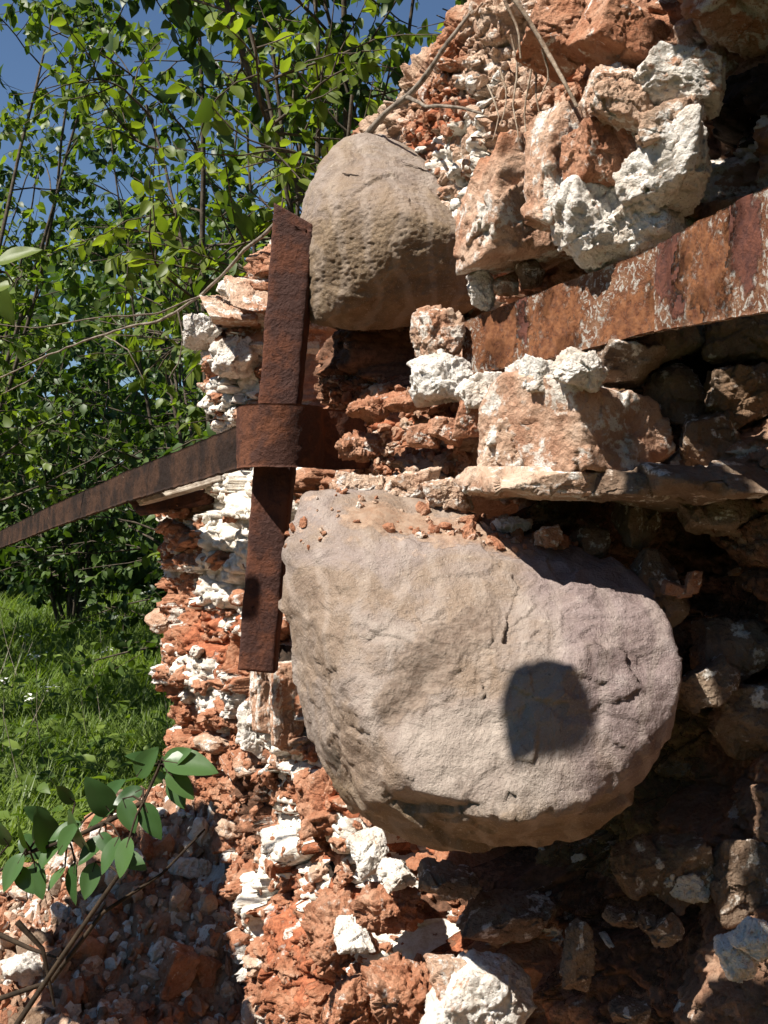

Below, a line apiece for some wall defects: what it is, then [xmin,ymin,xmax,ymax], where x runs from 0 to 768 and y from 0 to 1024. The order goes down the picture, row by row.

corrosion [467,193,764,371]